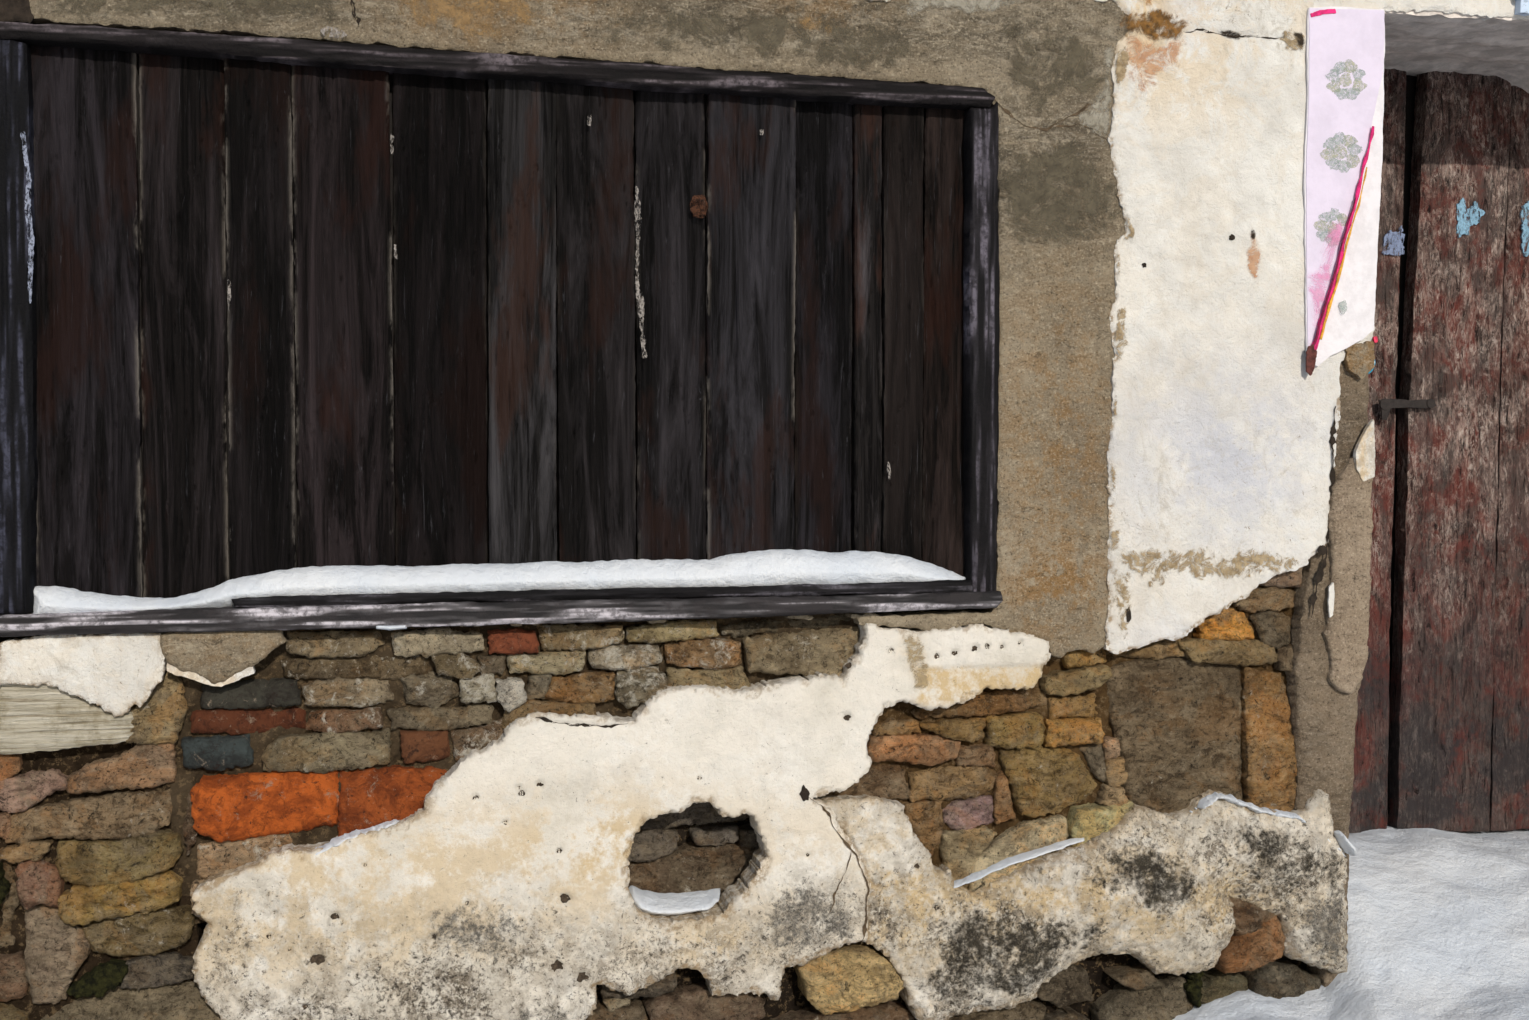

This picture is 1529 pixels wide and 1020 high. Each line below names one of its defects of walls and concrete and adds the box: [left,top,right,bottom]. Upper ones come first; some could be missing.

flaking render [0,0,34,24]
peeling [320,26,347,39]
crack [350,0,361,25]
peeling [1115,47,1130,83]
peeling [1115,307,1128,360]
flaking render [825,530,1303,892]
flaking render [0,612,917,1020]
crack [810,798,870,944]
damp [1089,841,1202,918]
damp [1237,816,1345,962]
damp [921,906,1108,1006]
flaking render [949,897,1322,1020]